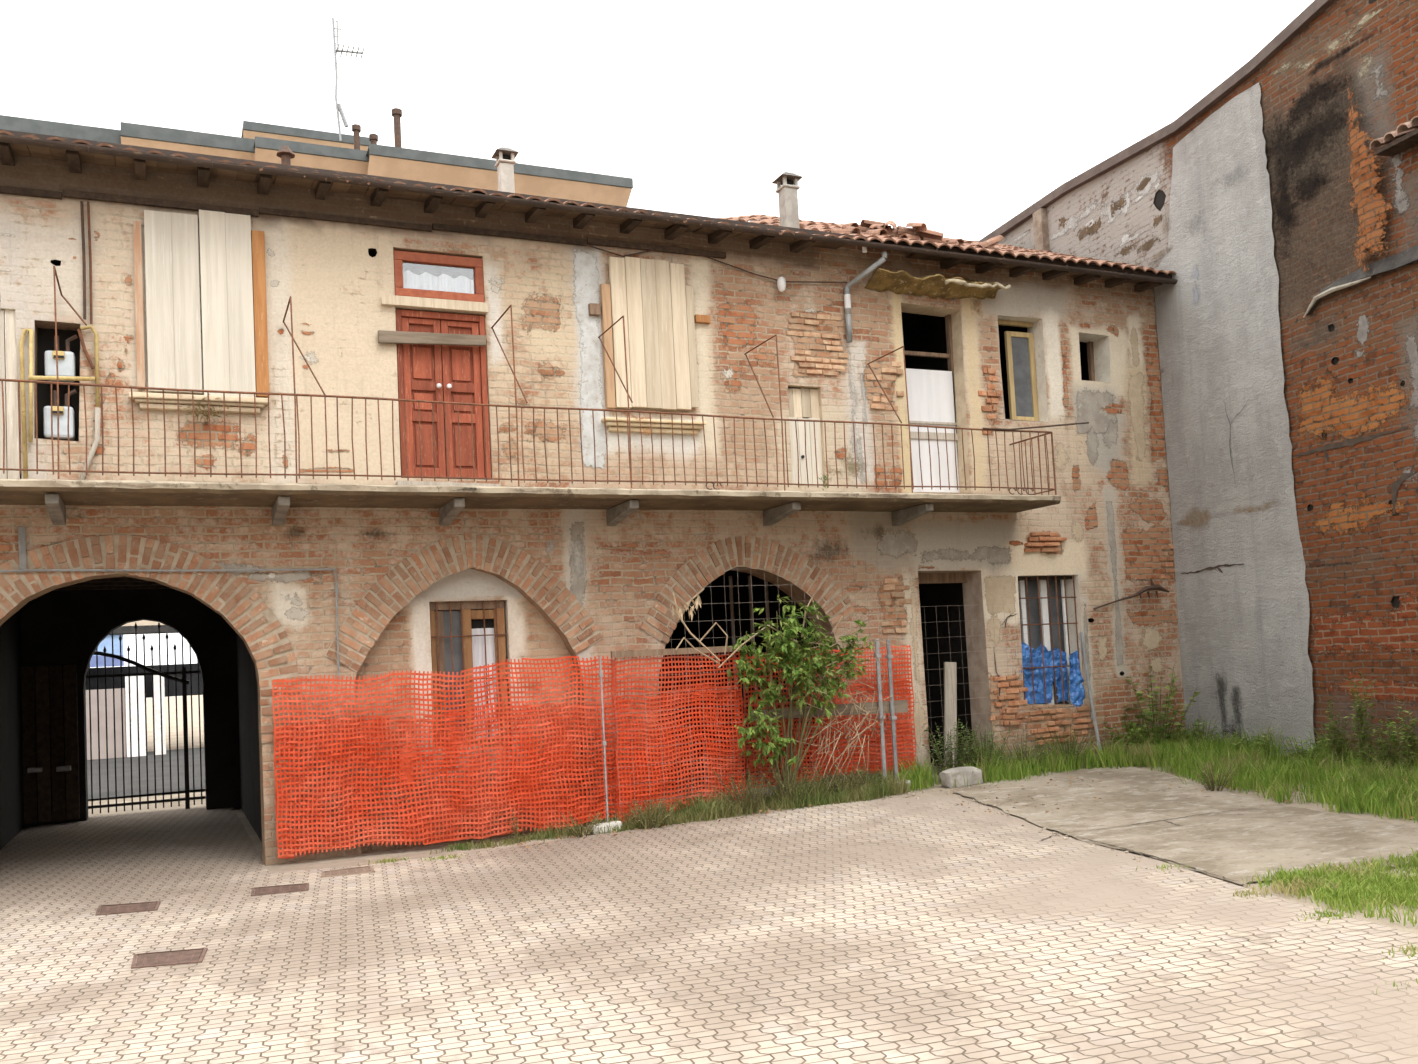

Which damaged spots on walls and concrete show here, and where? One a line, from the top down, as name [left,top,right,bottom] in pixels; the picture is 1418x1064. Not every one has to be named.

flaking render [1051,170,1162,241]
flaking render [1114,215,1163,256]
damp [1273,167,1326,255]
flaking render [498,249,608,470]
spalling [717,301,904,411]
flaking render [1080,323,1119,337]
flaking render [1052,335,1176,582]
flaking render [845,502,1098,748]
flaking render [1127,608,1178,676]